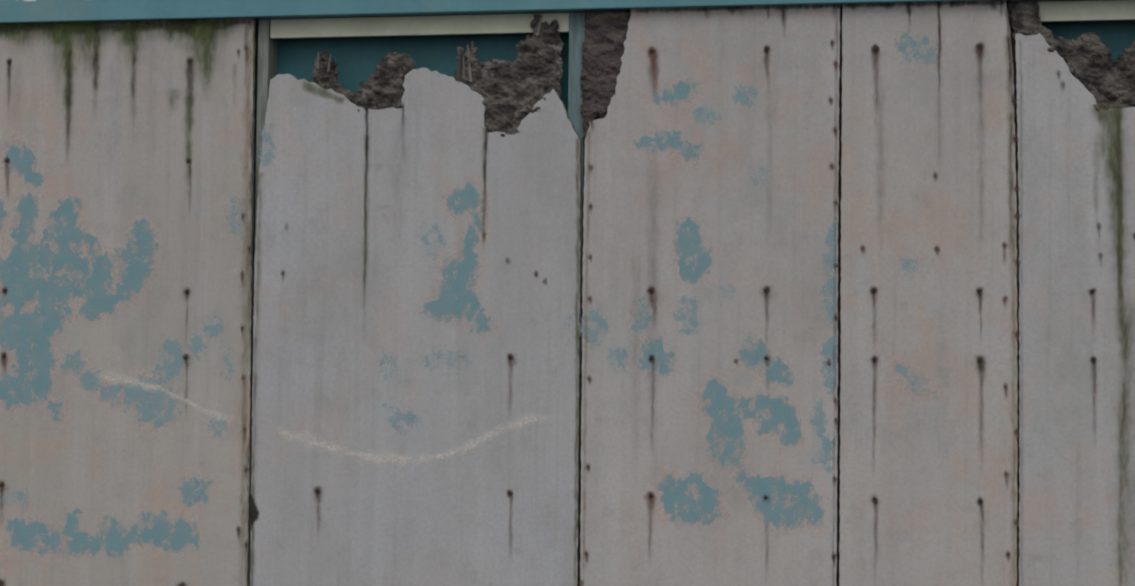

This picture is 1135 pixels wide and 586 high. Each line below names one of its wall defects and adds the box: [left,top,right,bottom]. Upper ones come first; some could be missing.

leakage [54,23,72,131]
leakage [90,22,98,86]
leakage [1099,107,1123,273]
peeling [0,134,223,432]
peeling [421,176,491,334]
peeling [569,295,674,376]
peeling [673,217,712,335]
peeling [695,217,837,531]
peeling [2,477,213,561]
peeling [656,470,727,525]